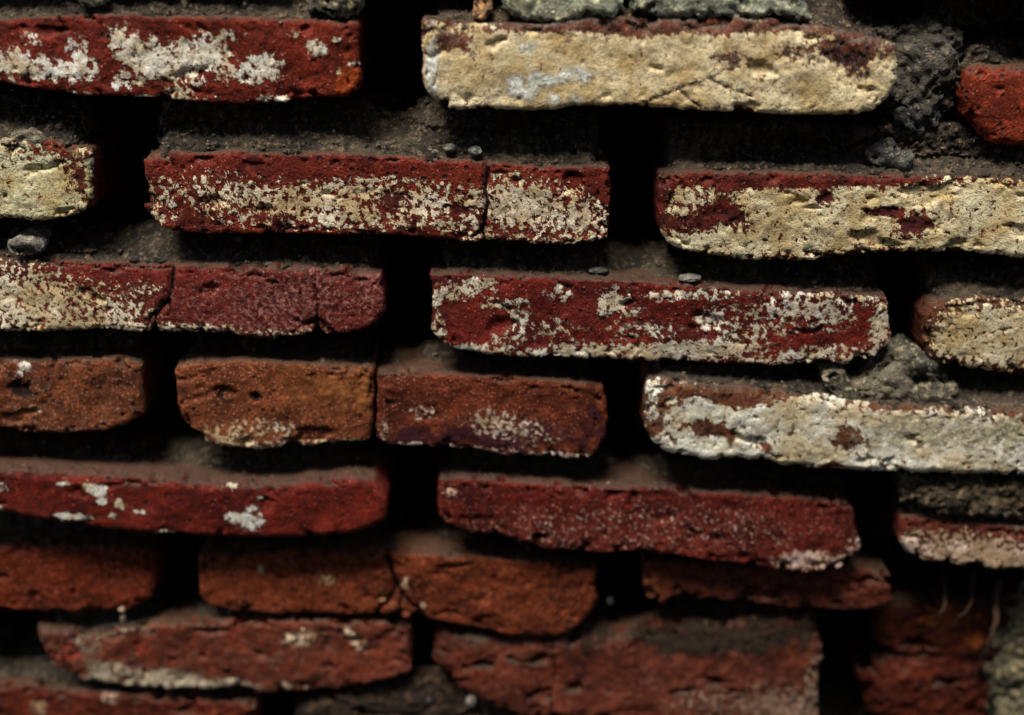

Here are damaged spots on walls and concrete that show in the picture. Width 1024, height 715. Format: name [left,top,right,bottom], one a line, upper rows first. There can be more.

crack [471,164,490,237]
crack [149,264,176,324]